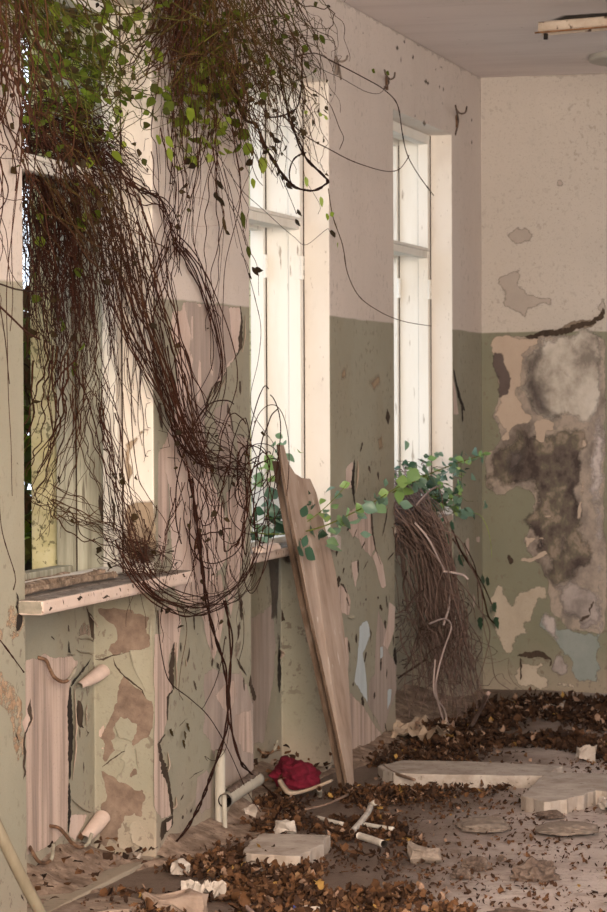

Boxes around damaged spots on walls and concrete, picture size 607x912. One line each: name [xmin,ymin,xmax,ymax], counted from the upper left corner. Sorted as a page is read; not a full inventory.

crack [526,308,605,339]
spalling [18,601,52,614]
peeling [25,301,291,855]
peeling [337,442,410,749]
leakage [485,335,607,634]
peeling [490,580,602,690]
flaking render [490,328,604,538]